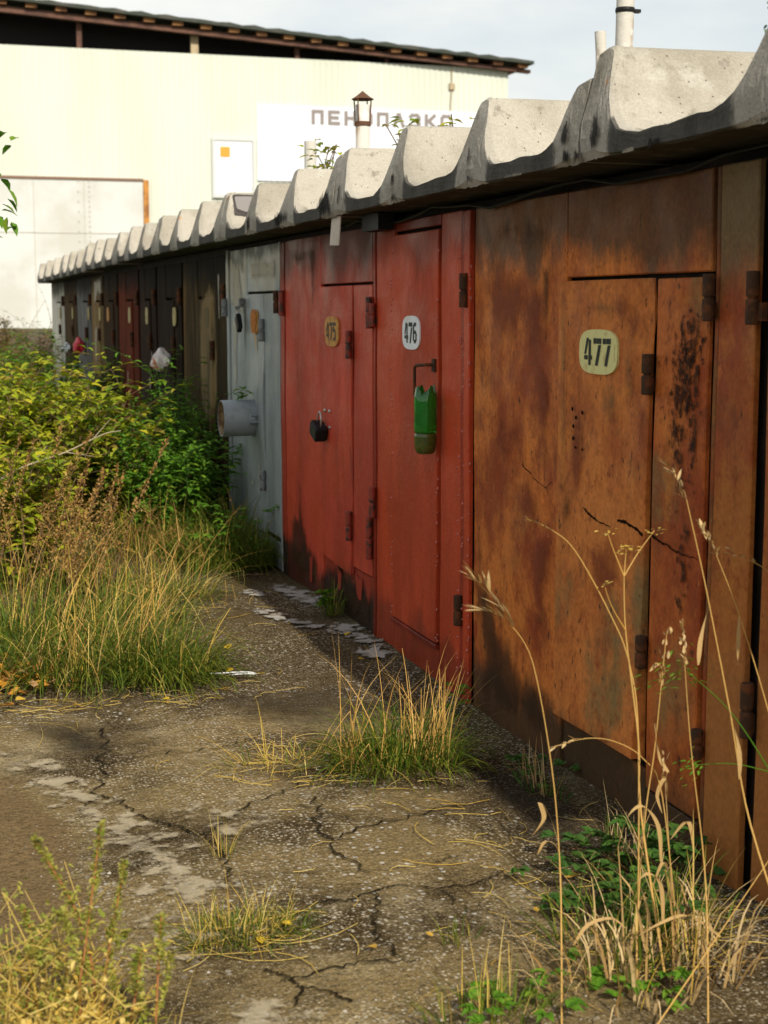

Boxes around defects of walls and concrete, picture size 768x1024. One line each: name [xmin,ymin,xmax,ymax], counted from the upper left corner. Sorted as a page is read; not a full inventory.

rust [659,305,707,495]
crack [583,508,698,560]